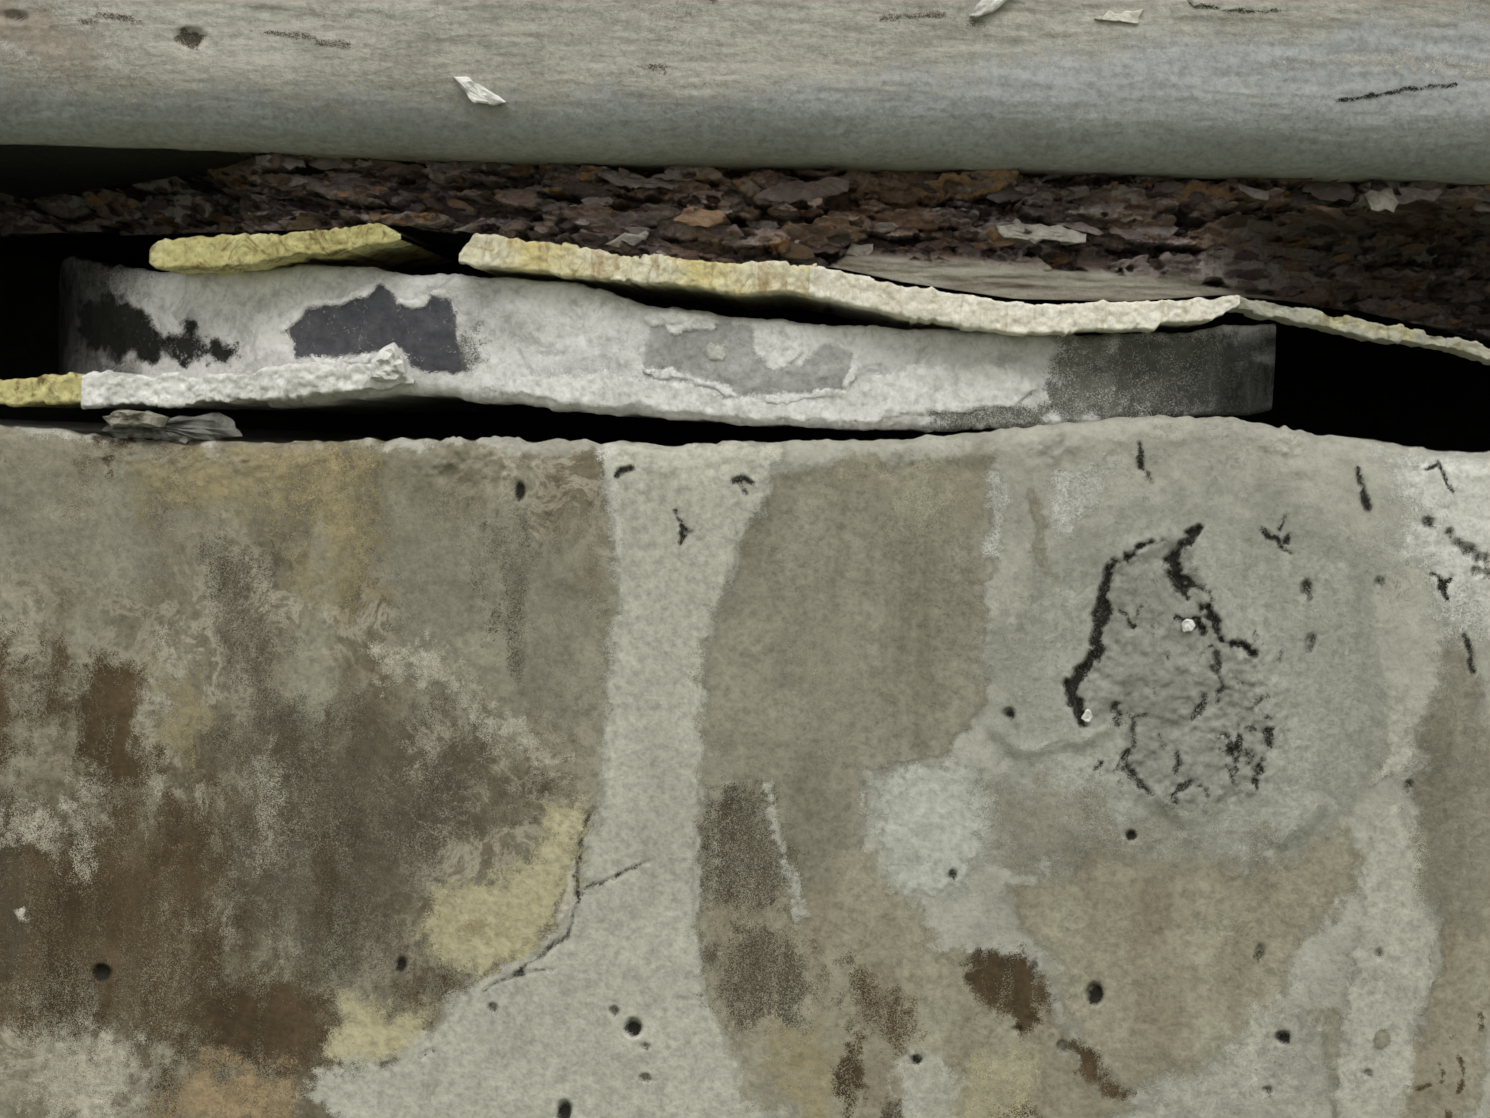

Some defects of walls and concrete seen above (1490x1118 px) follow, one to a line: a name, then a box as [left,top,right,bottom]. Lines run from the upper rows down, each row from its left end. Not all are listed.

damp [249,13,394,50]
damp [1263,46,1490,80]
rust [523,169,681,228]
rust [755,177,850,203]
rust [1302,181,1442,213]
rust [606,227,650,247]
rust [674,206,744,240]
rust [808,222,899,256]
rust [986,181,1183,259]
damp [58,256,243,375]
damp [922,324,1276,432]
crack [1259,516,1292,555]